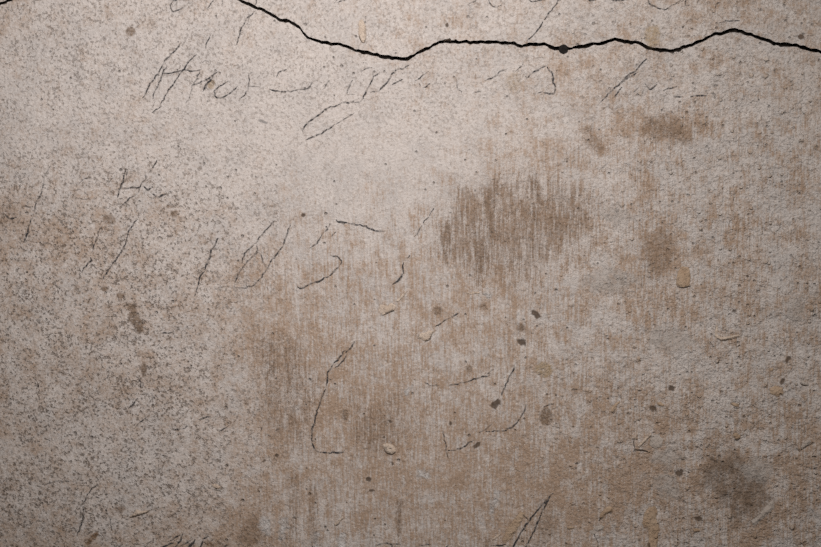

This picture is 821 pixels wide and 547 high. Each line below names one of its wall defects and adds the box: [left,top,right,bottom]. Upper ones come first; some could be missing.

crack [238,0,821,61]